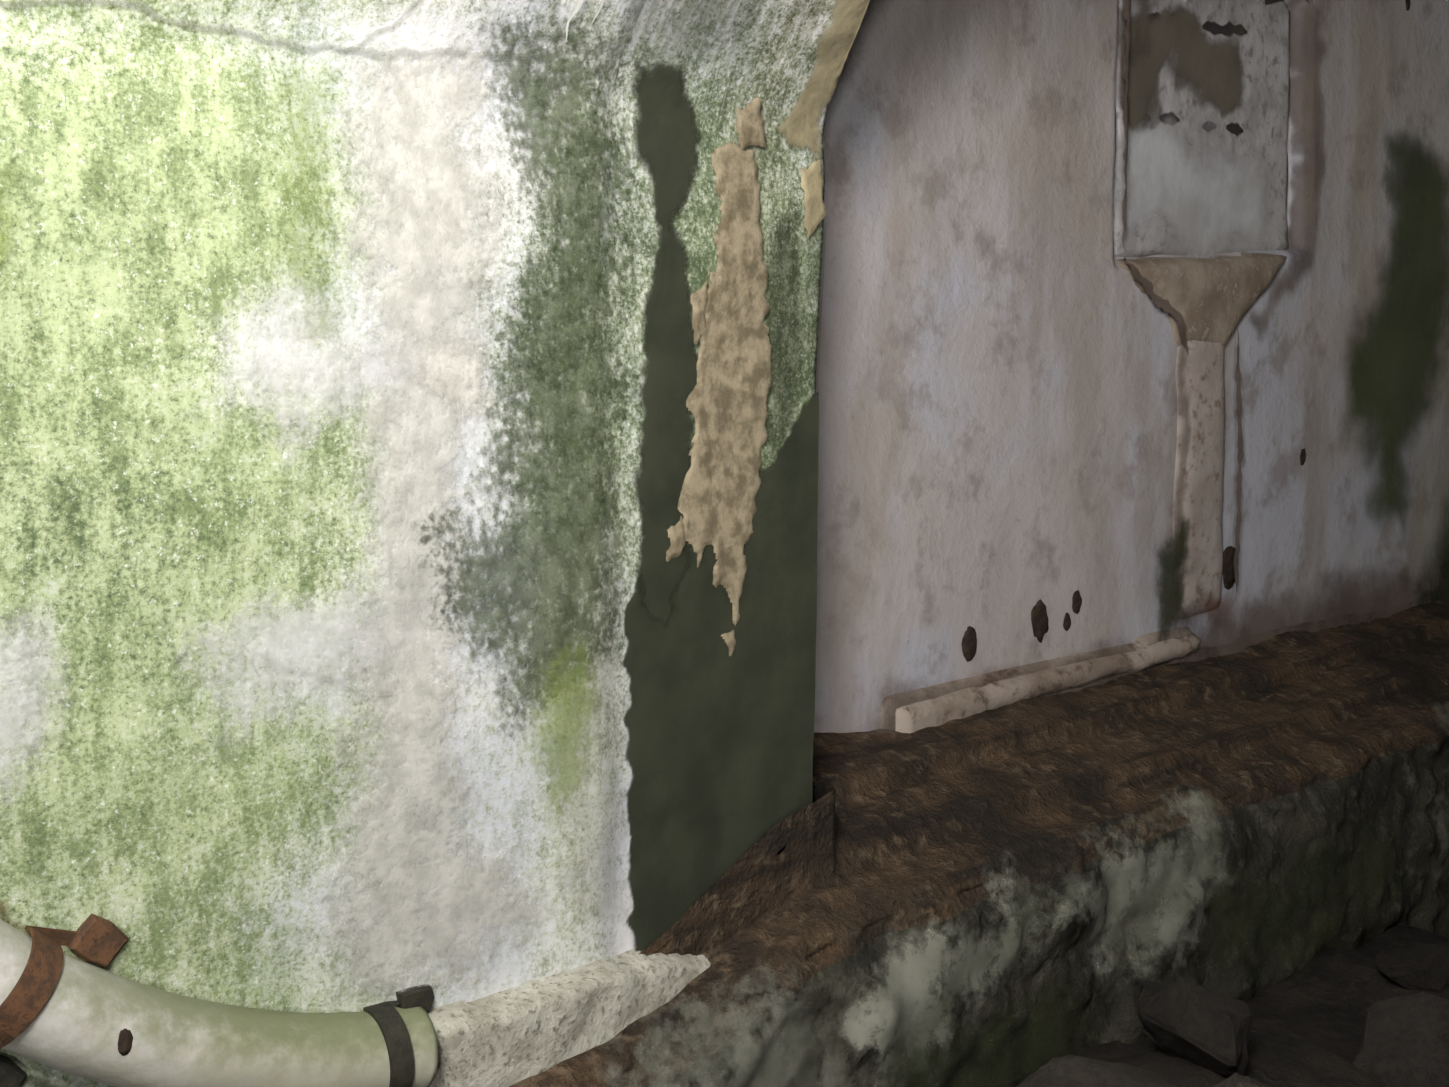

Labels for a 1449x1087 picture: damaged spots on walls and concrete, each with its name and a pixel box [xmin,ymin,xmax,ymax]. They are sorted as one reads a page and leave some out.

leakage [1121,0,1188,354]
peeling [666,0,870,657]
leakage [1169,0,1449,664]
leakage [236,46,537,992]
spalling [961,626,977,662]
spalling [1031,590,1082,643]
leakage [1158,521,1193,636]
leakage [879,690,937,734]
leakage [840,792,1228,1087]
leakage [23,1077,64,1087]
leakage [685,998,811,1087]